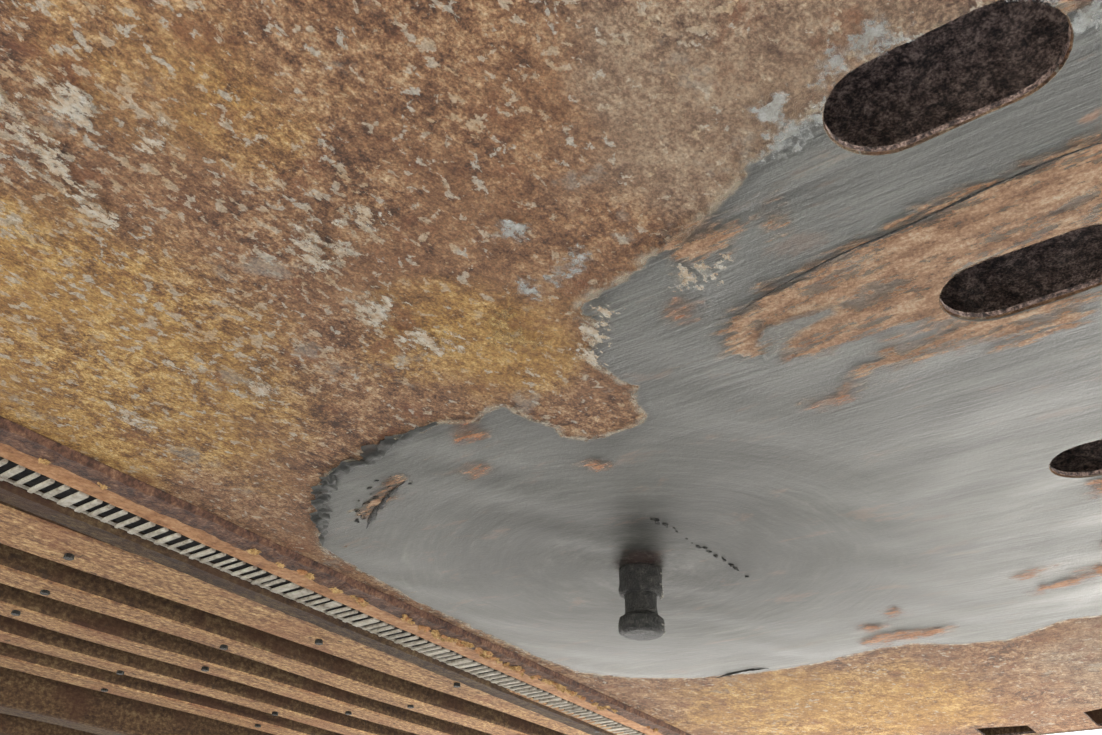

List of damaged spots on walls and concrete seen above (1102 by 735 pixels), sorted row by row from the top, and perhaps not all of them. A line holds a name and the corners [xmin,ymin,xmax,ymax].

rust [660,198,790,263]
rust [711,133,1102,410]
damp [758,308,835,360]
rust [359,475,407,519]
rust [1013,564,1102,595]
rust [857,608,955,645]
rust [400,614,618,713]